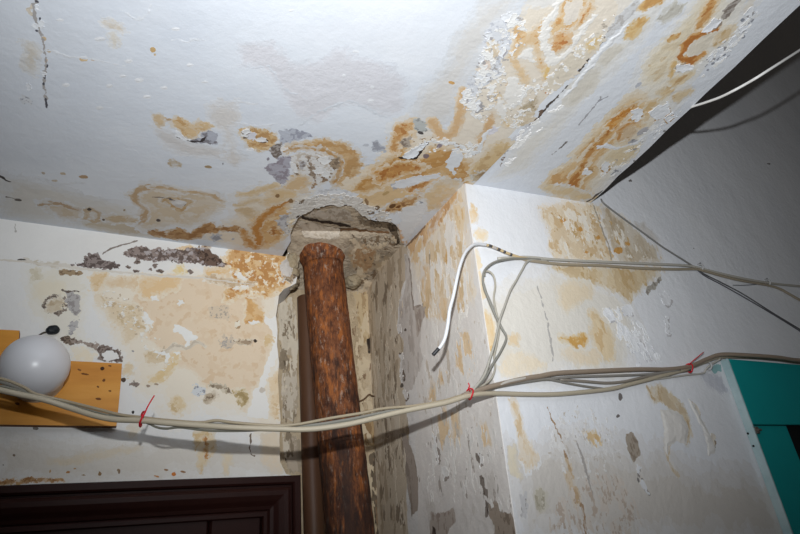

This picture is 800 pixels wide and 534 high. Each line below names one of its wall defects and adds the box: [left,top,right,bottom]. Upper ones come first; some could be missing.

crack [31,0,48,106]
water stain [148,97,252,169]
peeling [459,0,640,167]
peeling [41,291,123,363]
water stain [0,170,317,484]
peeling [59,234,284,297]
spalling [241,118,516,534]
water stain [235,0,783,534]